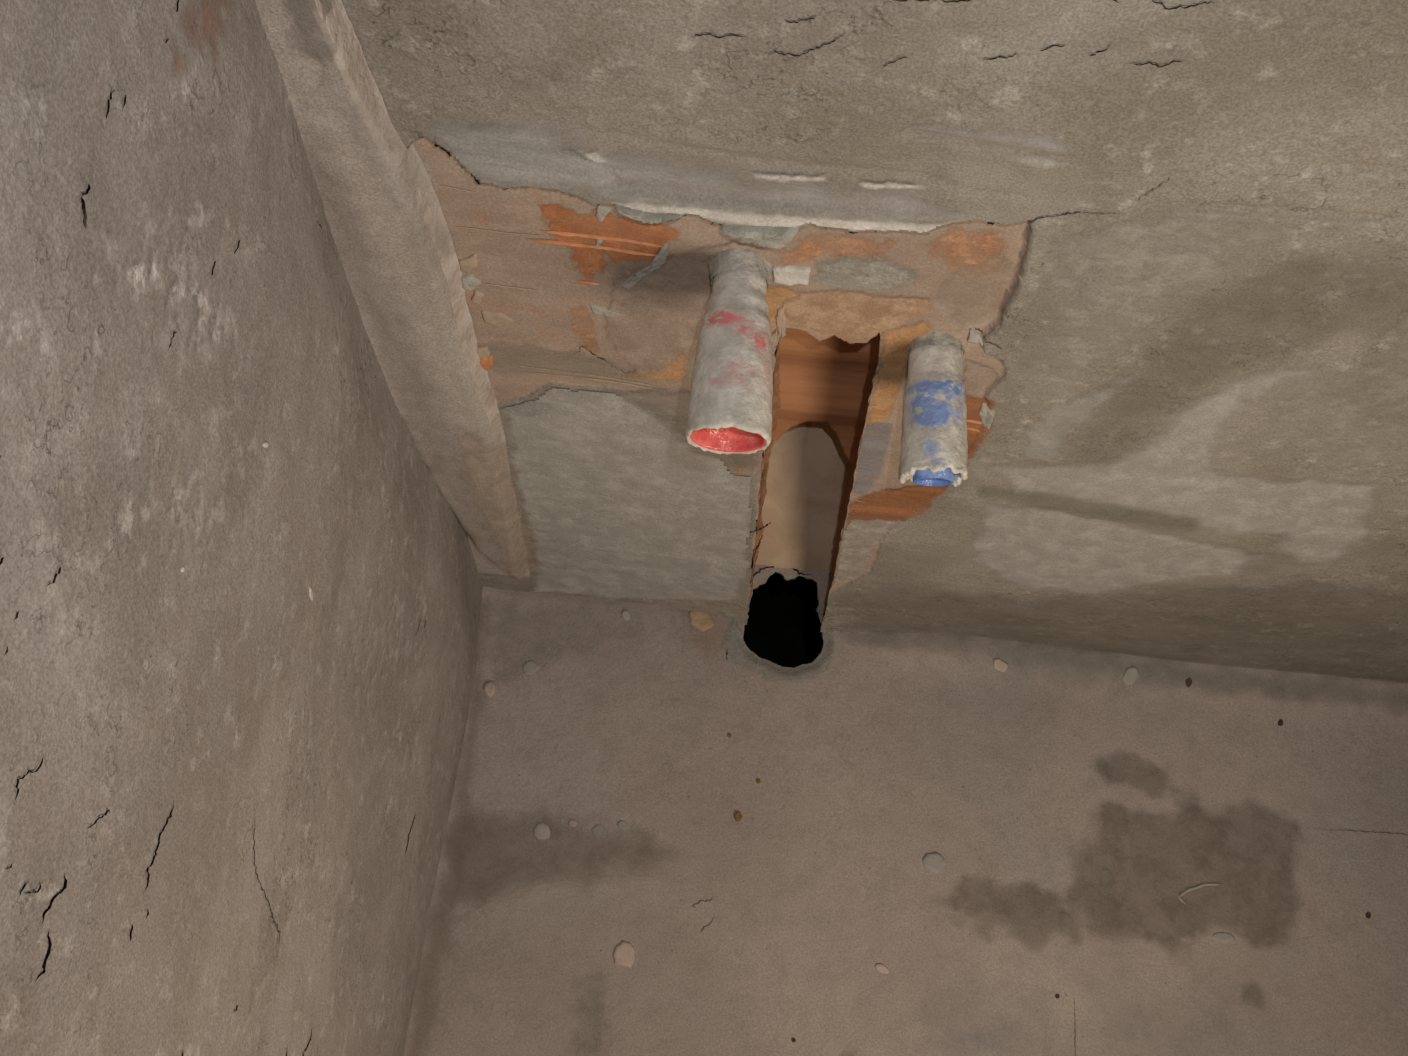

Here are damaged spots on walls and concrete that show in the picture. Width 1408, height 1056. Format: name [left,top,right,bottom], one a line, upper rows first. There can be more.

crack [889,0,971,8]
crack [1152,0,1214,10]
crack [694,16,846,56]
crack [983,45,1183,68]
flaking render [312,0,1030,594]
crack [15,758,43,802]
damp [1073,805,1296,945]
crack [8,863,67,980]